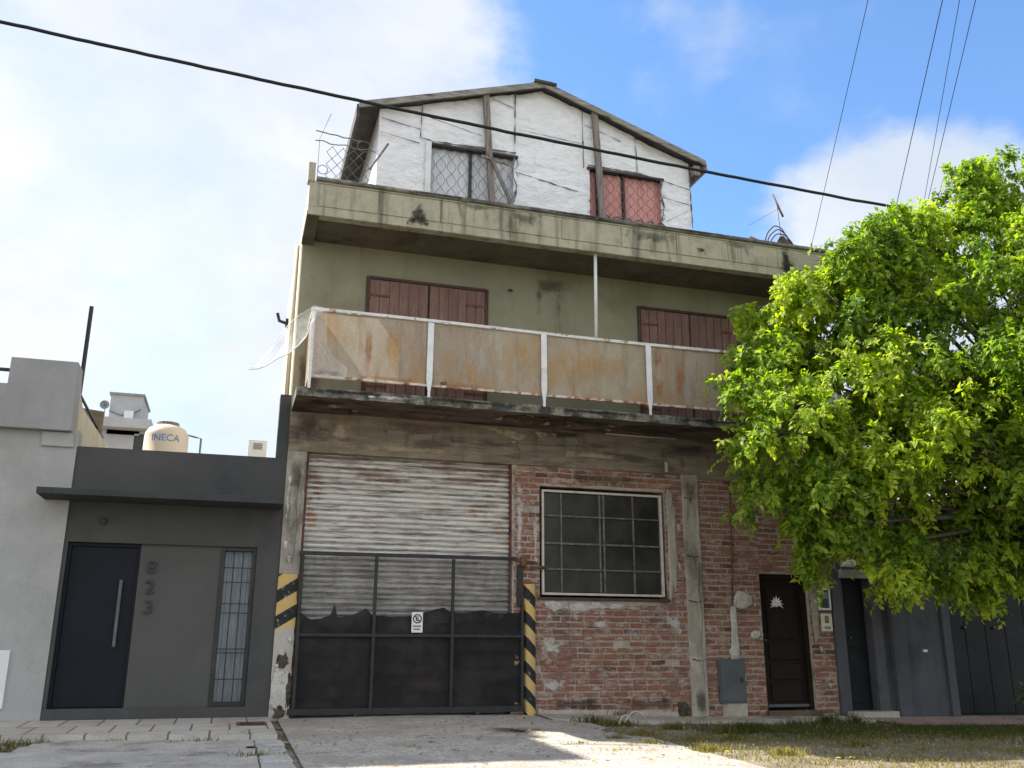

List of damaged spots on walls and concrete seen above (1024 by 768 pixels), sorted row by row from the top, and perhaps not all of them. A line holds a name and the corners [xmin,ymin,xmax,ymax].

mould [407,207,428,225]
peeling [239,637,292,725]